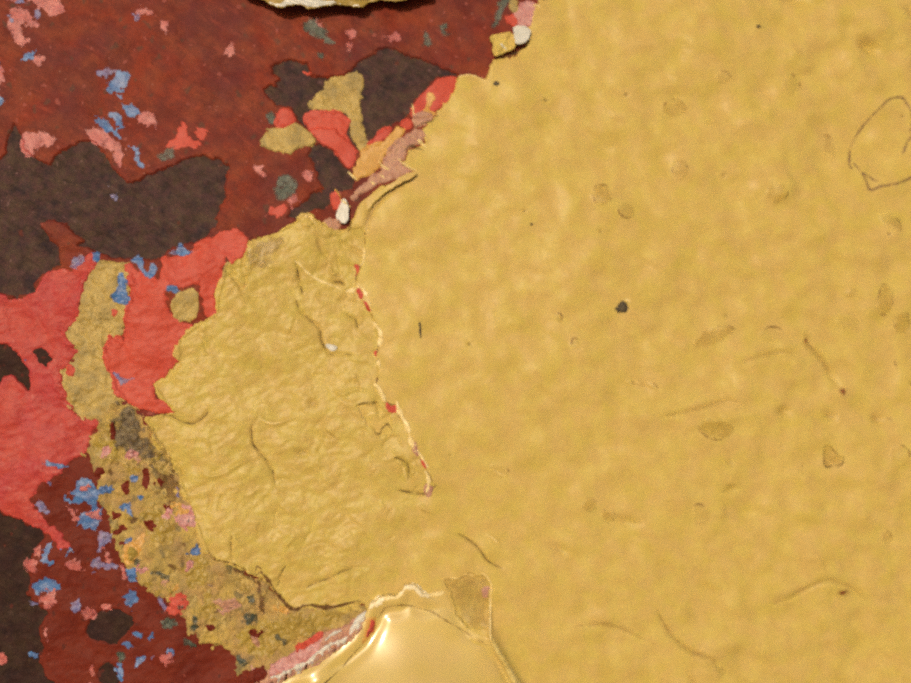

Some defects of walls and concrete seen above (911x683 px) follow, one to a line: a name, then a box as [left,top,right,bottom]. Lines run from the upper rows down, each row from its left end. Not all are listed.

peeling [0,0,540,683]